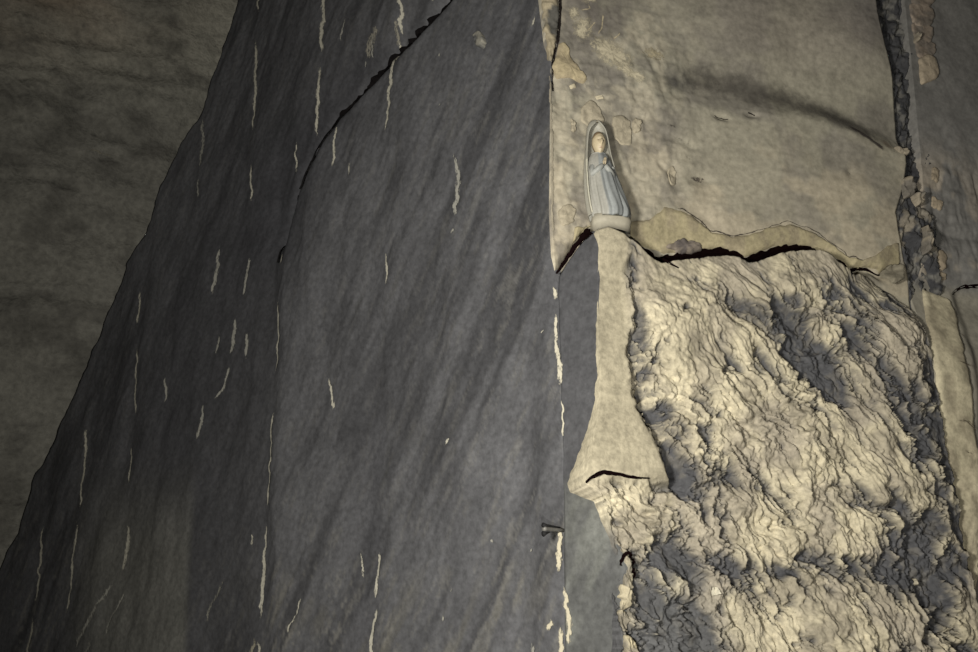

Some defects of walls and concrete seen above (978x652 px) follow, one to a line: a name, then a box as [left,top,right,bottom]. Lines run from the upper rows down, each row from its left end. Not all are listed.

peeling [909,0,939,85]
crack [297,0,452,201]
peeling [931,196,943,211]
crack [556,228,593,274]
crack [629,237,815,269]
crack [837,260,880,276]
spalling [558,207,978,652]
crack [585,470,650,483]